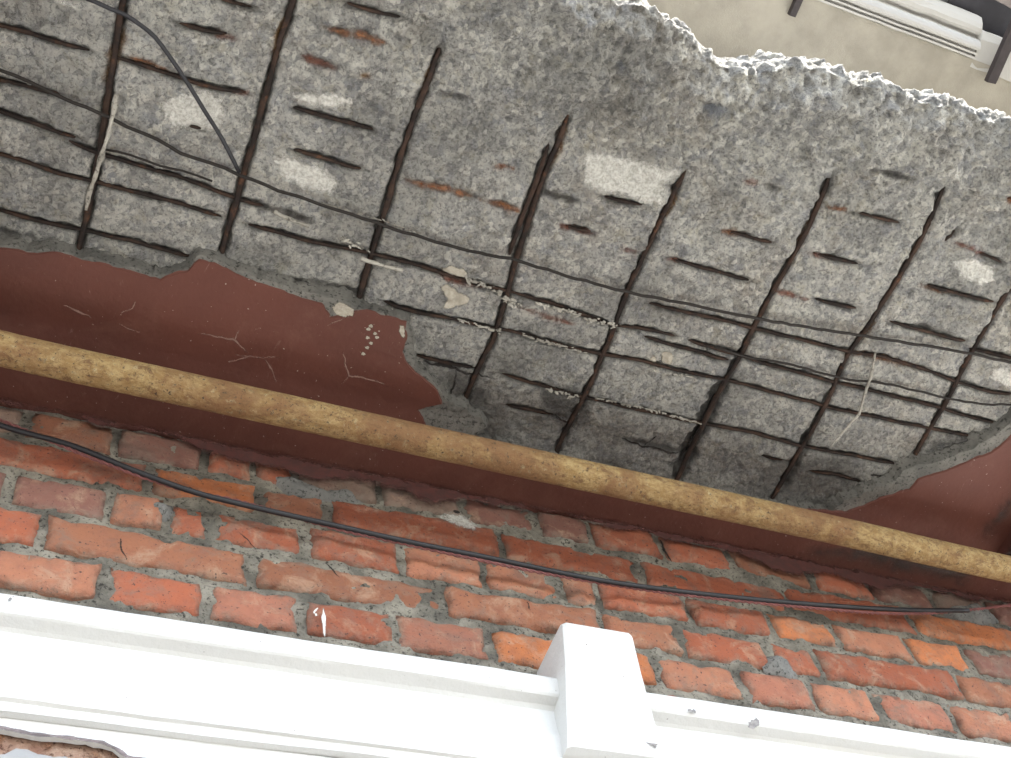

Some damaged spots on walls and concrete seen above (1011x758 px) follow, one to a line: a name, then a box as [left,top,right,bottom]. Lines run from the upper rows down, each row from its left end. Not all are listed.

corrosion [329,28,385,44]
corrosion [302,55,333,68]
corrosion [412,181,471,196]
spalling [0,0,1011,505]
flaking render [0,726,143,758]